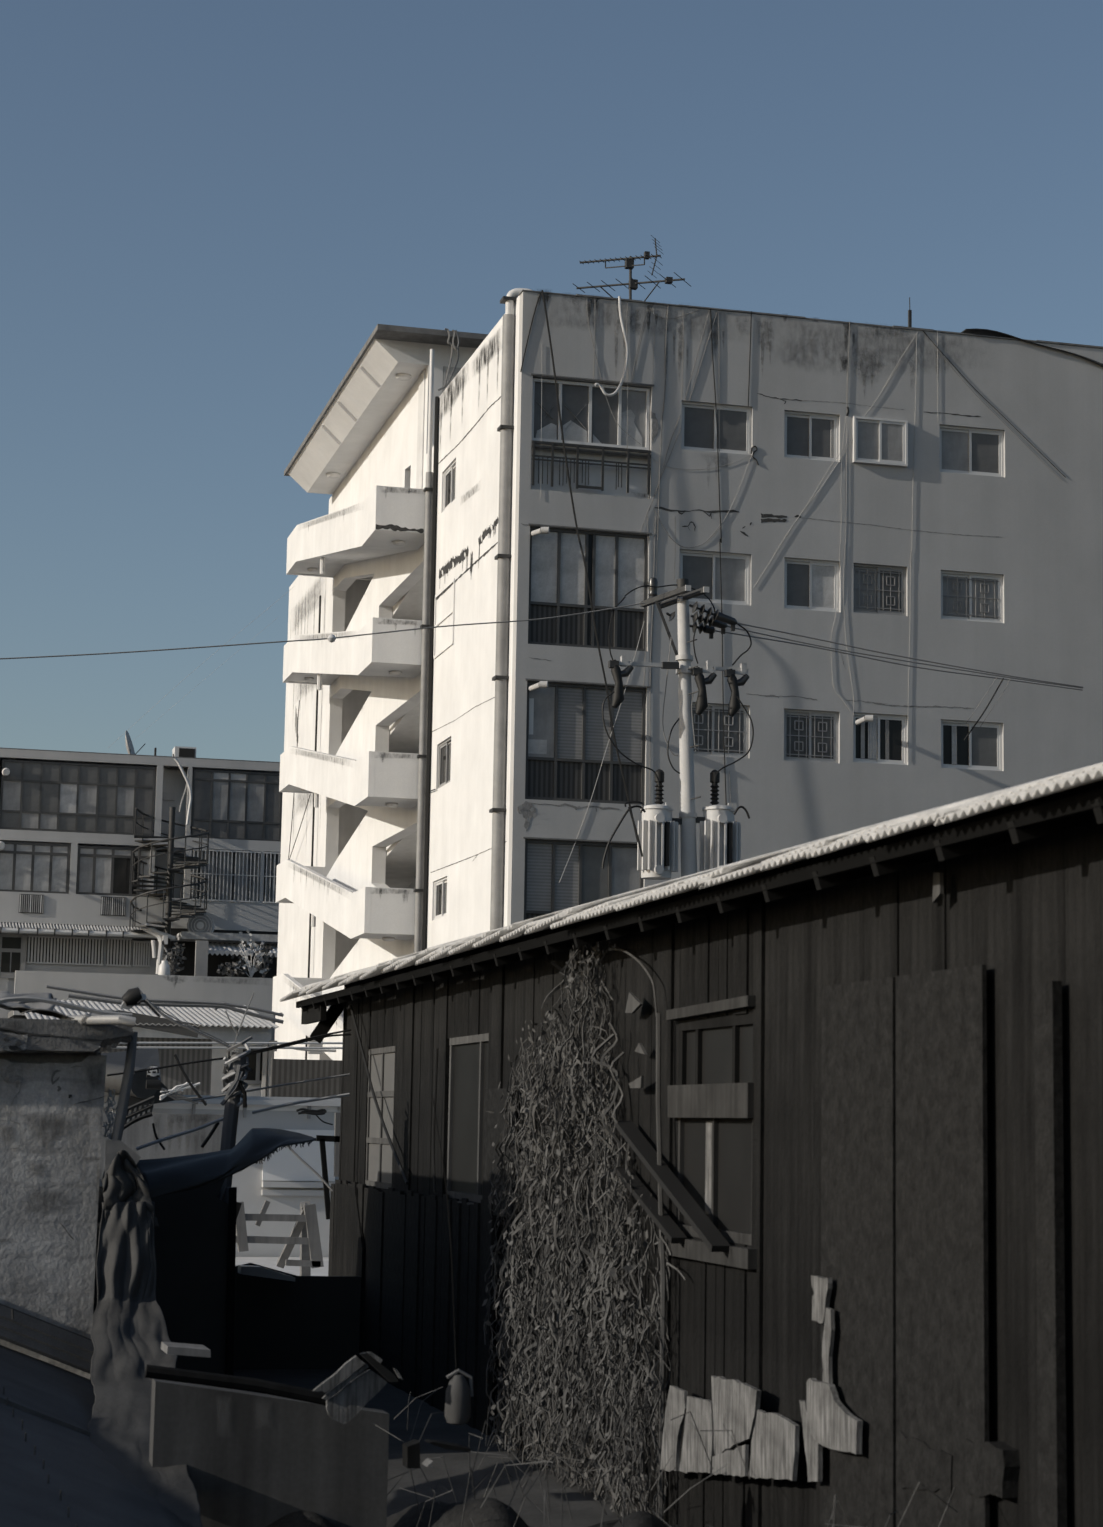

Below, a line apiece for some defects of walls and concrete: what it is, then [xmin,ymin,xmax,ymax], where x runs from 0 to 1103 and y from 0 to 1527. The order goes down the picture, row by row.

water stain [440,335,499,442]
spalling [0,1031,28,1052]